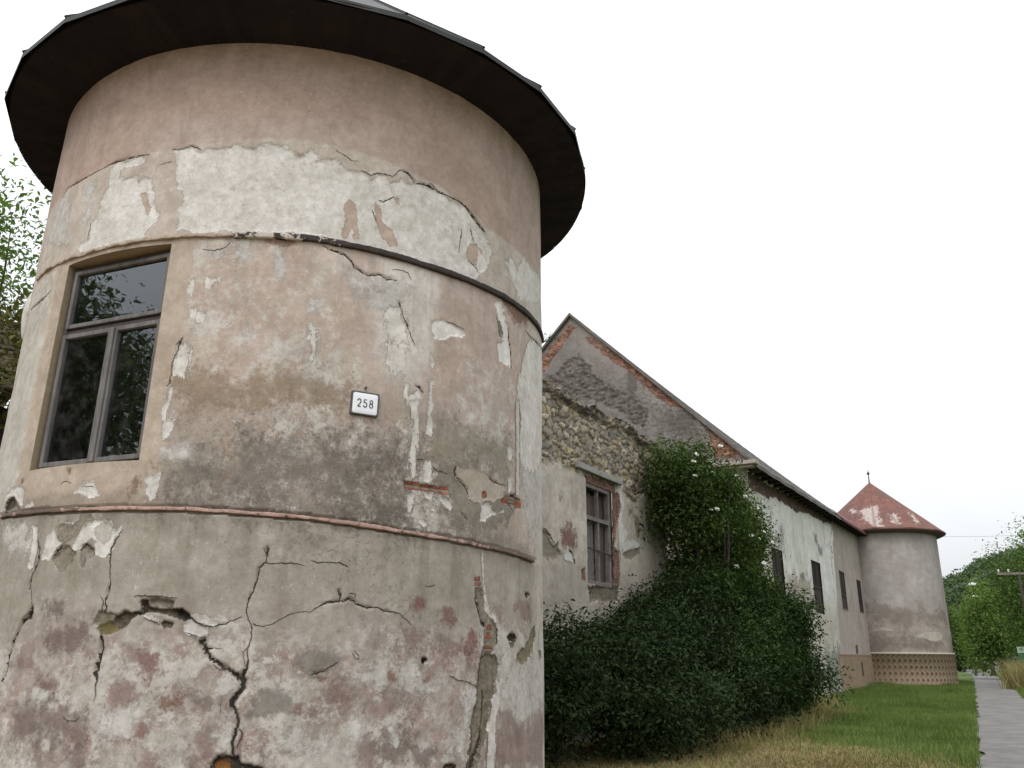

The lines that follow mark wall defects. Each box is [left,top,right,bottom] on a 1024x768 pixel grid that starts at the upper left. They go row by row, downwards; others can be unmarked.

peeling [78,155,160,252]
crack [63,146,201,196]
peeling [174,142,492,280]
peeling [187,275,223,324]
peeling [144,342,194,501]
peeling [340,256,648,532]
crack [2,541,40,682]
peeling [2,479,124,571]
crack [63,529,411,768]
spalling [444,550,542,768]
peeling [542,528,563,561]